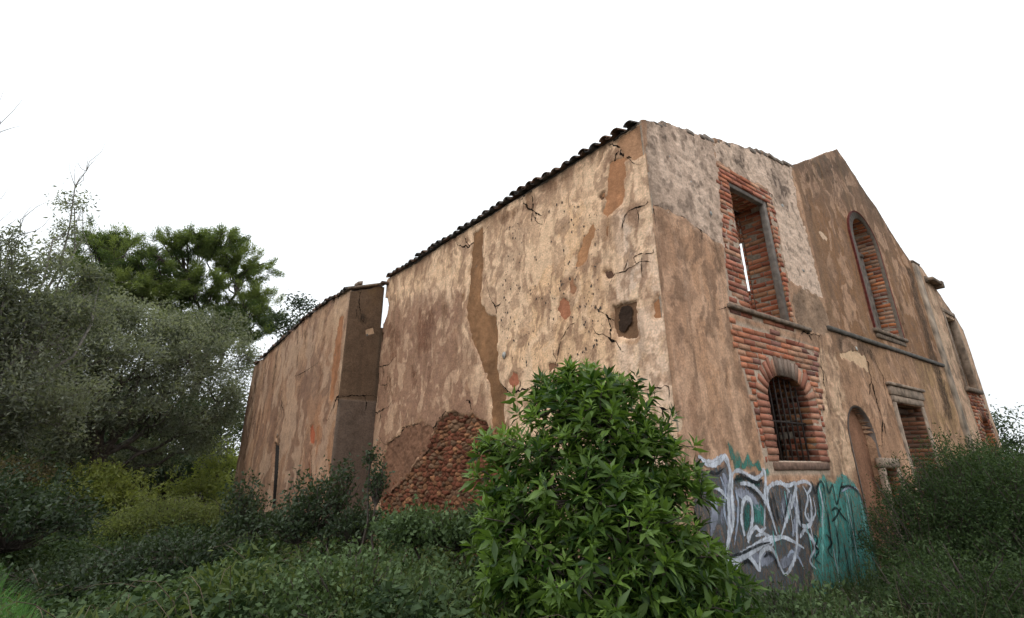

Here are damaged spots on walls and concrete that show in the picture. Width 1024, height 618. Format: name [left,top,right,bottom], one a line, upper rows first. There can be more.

crack [521,197,542,224]
crack [621,201,709,236]
flaking render [558,120,831,339]
crack [552,252,654,371]
flaking render [380,227,519,520]